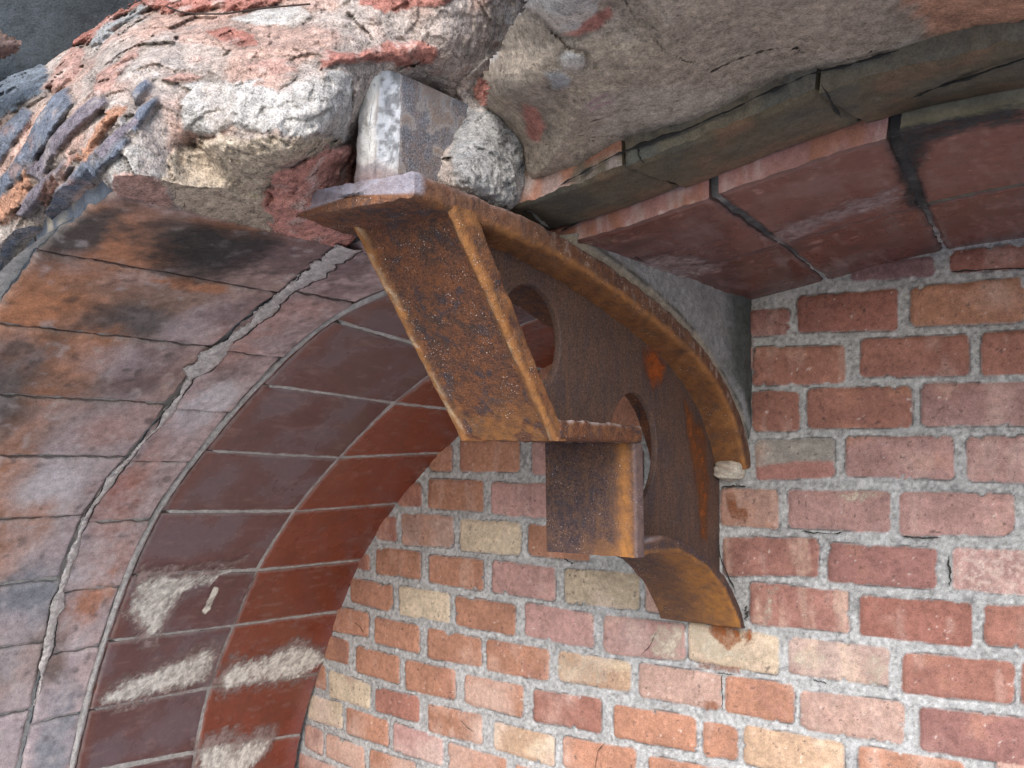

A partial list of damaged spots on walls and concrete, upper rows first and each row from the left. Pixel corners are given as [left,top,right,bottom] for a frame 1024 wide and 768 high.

spalling [0,0,528,271]
corrosion [646,350,665,382]
crack [34,245,363,706]
damp [121,555,248,648]
damp [98,637,326,712]
damp [193,725,276,768]